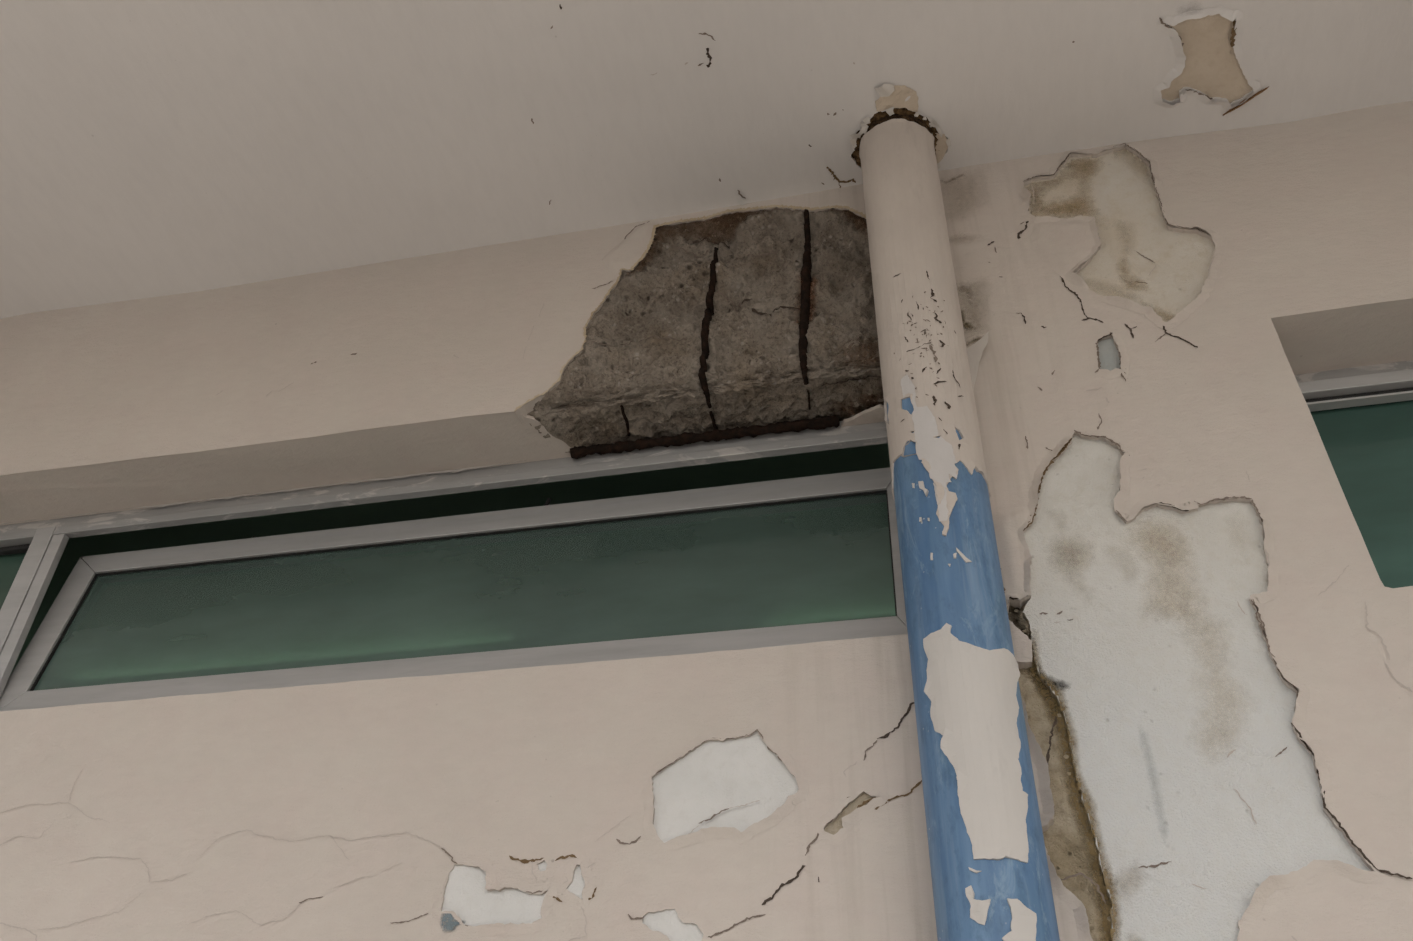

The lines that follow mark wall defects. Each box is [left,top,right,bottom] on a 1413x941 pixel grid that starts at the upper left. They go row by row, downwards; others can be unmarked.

rust [631,209,767,272]
spalling [514,190,989,459]
rust [844,210,867,229]
peeling [1016,142,1224,329]
peeling [1005,425,1413,941]
crack [0,770,452,941]
peeling [431,848,595,938]
crack [509,815,641,941]
peeling [628,898,714,941]
peeling [643,722,809,853]
crack [708,702,922,938]
leakage [1029,649,1118,941]